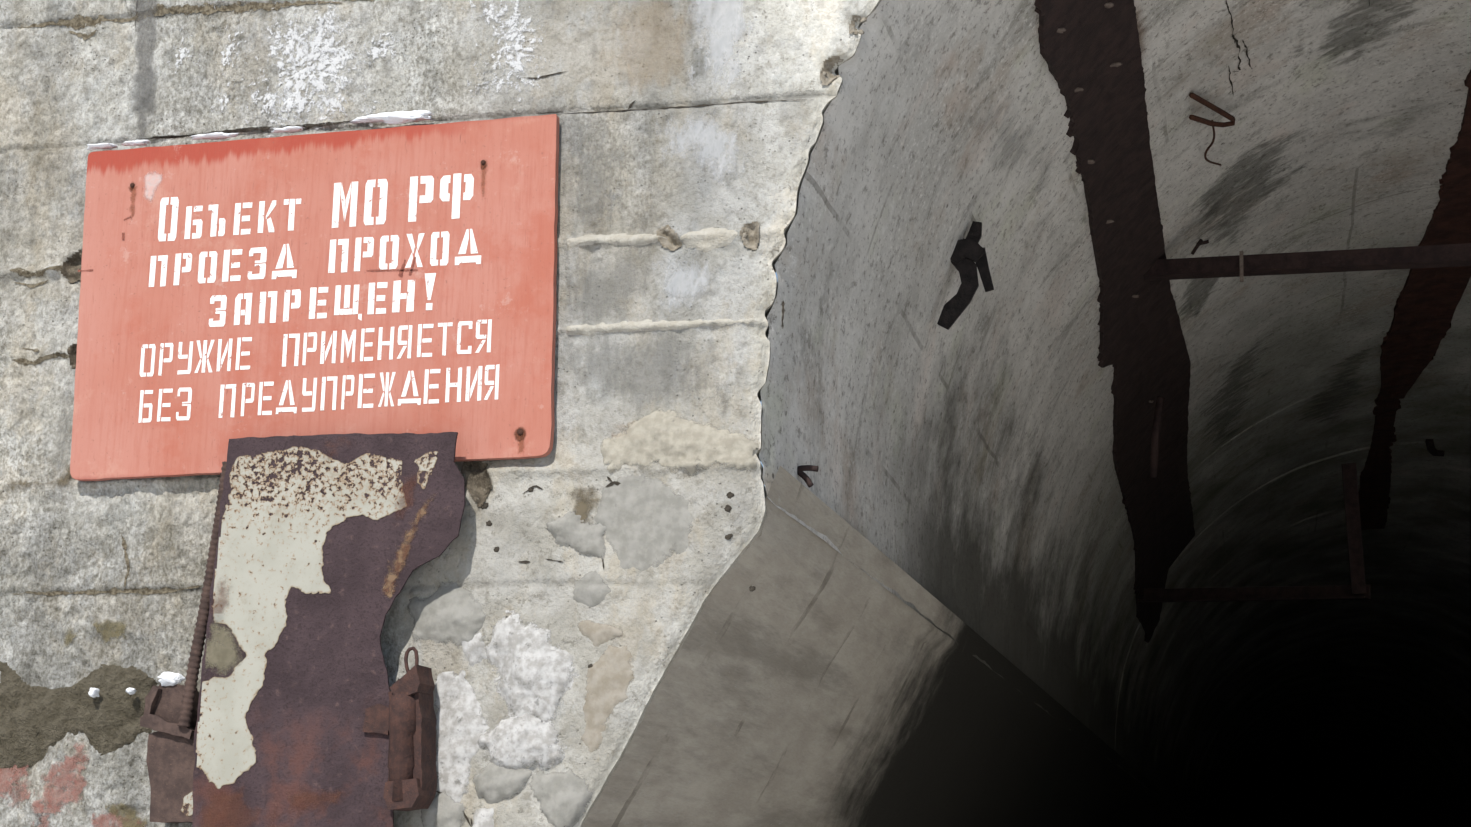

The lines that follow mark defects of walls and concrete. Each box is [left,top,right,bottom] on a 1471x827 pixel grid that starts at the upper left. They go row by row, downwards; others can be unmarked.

damp [136,0,193,134]
efflorescence [210,1,402,138]
rust [383,500,430,598]
flaking render [547,511,623,668]
peeling [0,661,21,684]